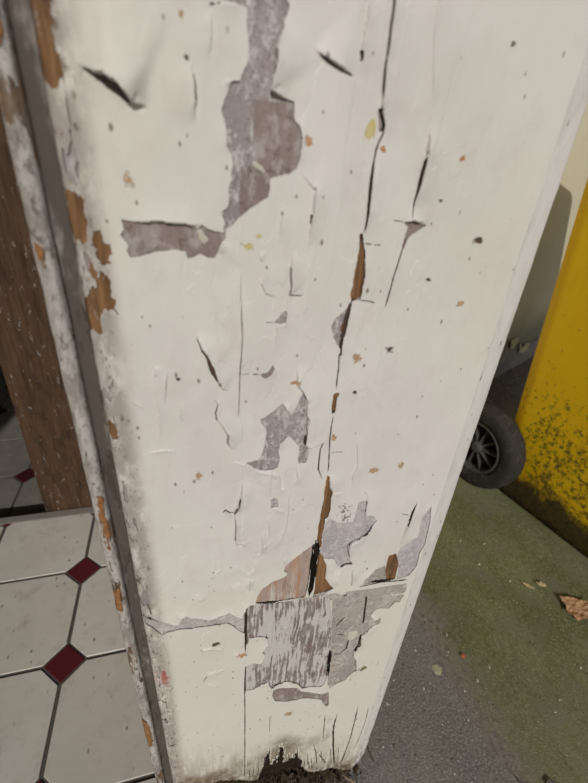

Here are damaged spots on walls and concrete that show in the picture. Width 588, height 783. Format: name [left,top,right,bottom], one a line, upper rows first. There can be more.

peeling [121,0,387,261]
peeling [100,310,119,323]
peeling [197,332,281,390]
peeling [223,367,332,549]
crack [244,0,451,775]
peeling [146,491,431,706]